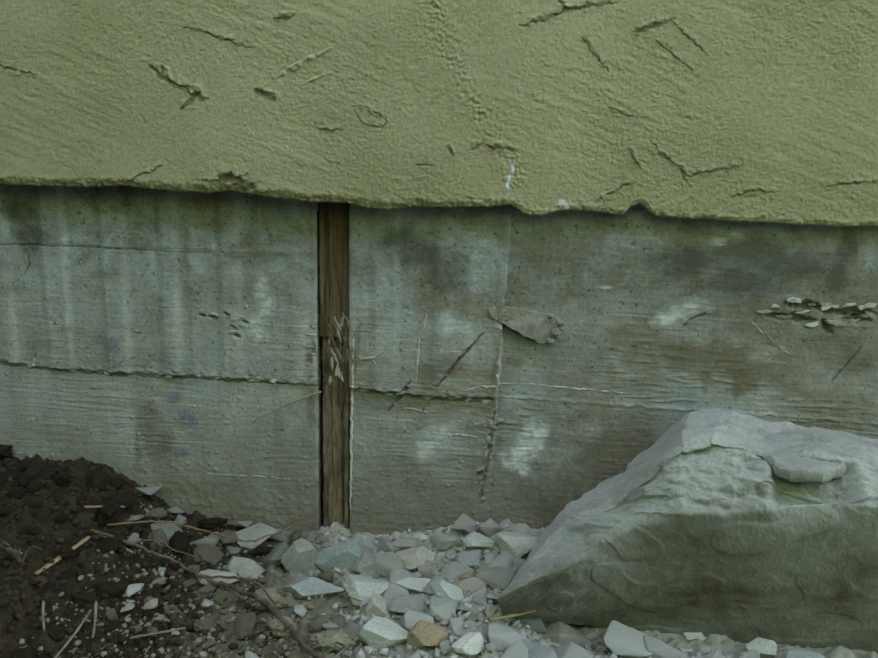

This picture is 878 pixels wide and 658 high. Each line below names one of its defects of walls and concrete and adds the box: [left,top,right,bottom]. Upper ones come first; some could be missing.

crack [518,0,619,26]
crack [582,35,609,72]
crack [633,17,708,71]
crack [255,89,275,102]
spalling [756,297,878,332]
crack [355,316,505,504]